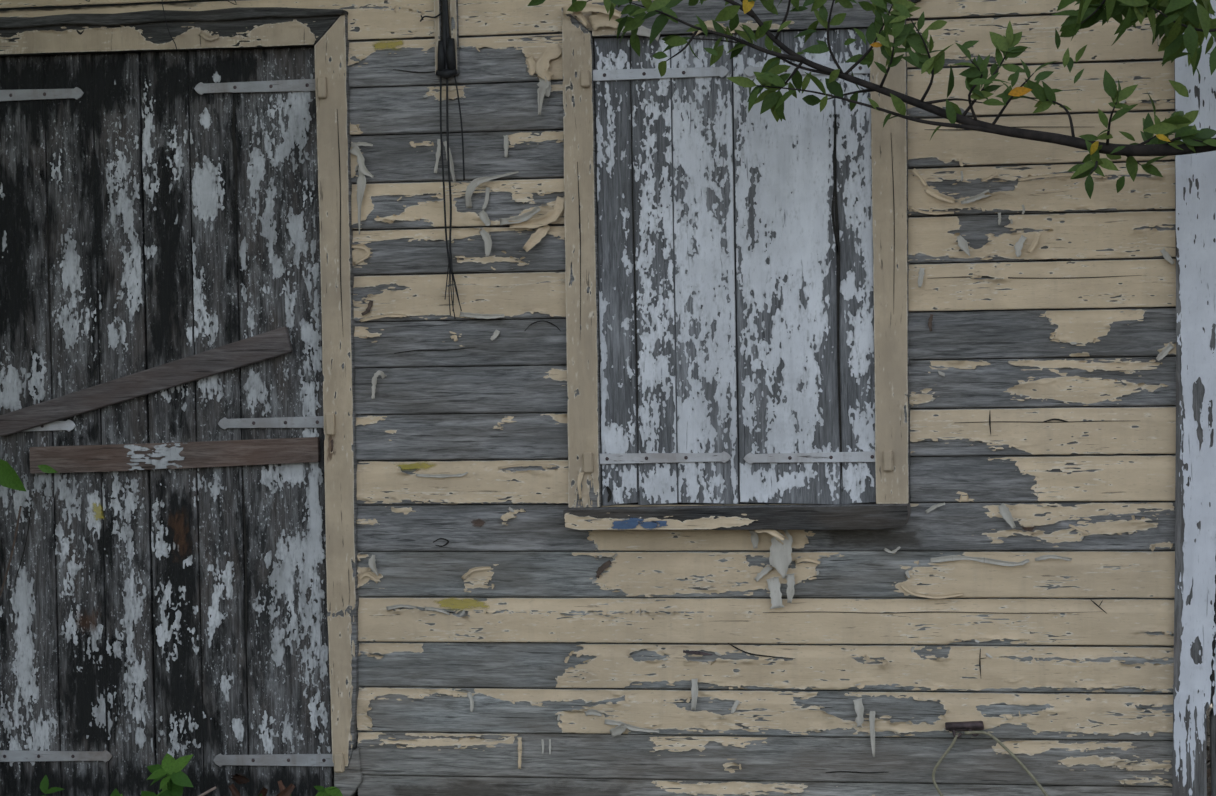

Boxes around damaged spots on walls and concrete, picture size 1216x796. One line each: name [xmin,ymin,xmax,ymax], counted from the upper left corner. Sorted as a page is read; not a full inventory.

peeling [0,4,428,56]
peeling [561,0,875,77]
peeling [0,79,226,412]
peeling [239,91,322,417]
peeling [349,44,580,478]
peeling [790,74,875,453]
peeling [908,157,1151,287]
peeling [1192,377,1214,450]
peeling [151,498,179,560]
peeling [0,562,58,771]
peeling [154,551,235,680]
peeling [230,710,304,754]